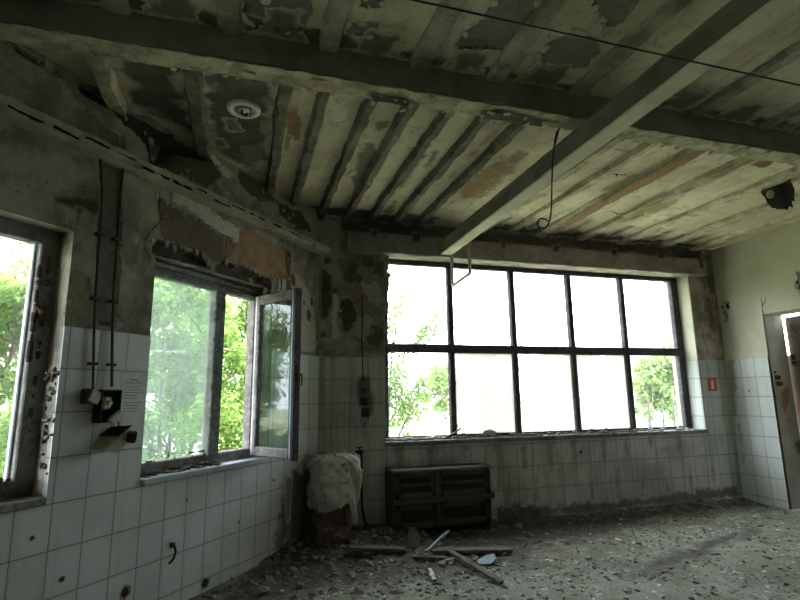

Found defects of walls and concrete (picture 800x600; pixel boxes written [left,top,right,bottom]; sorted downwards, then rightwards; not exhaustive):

peeling [242,0,315,35]
peeling [343,0,385,40]
peeling [455,0,541,54]
peeling [588,0,639,28]
peeling [535,29,601,70]
spalling [369,86,413,112]
spalling [479,105,546,132]
flaking render [8,86,313,243]
peeling [330,254,384,352]
flaking render [38,367,60,475]